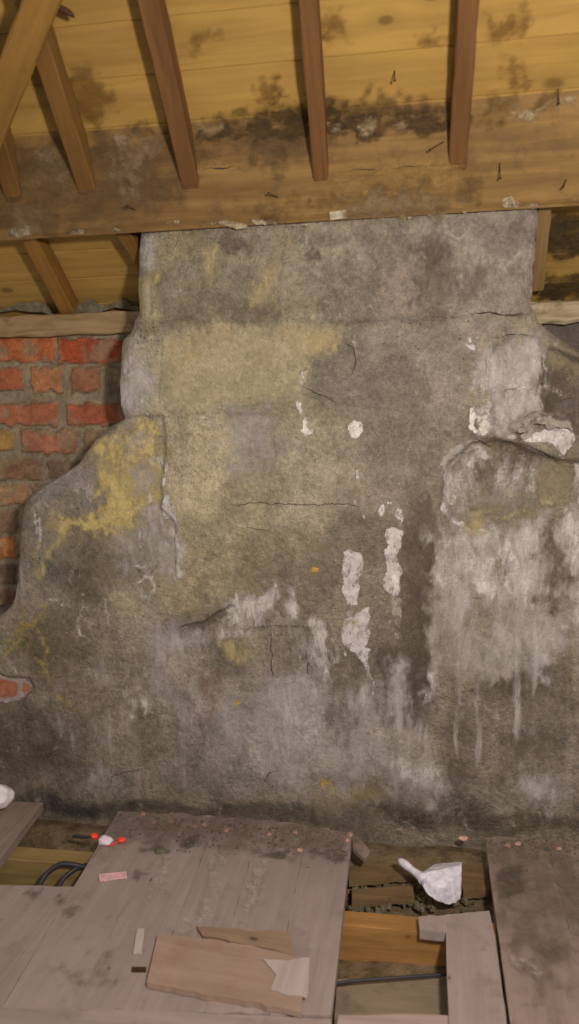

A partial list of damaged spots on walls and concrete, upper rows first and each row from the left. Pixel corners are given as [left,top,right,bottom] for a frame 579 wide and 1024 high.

leakage [198,77,309,142]
leakage [326,95,450,142]
peeling [347,420,363,439]
flaking render [439,384,579,528]
peeling [116,457,182,598]
crack [233,502,361,531]
peeling [378,502,404,639]
crack [178,602,233,630]
flaking render [0,675,33,704]
crack [249,625,309,676]
leakage [330,512,579,816]